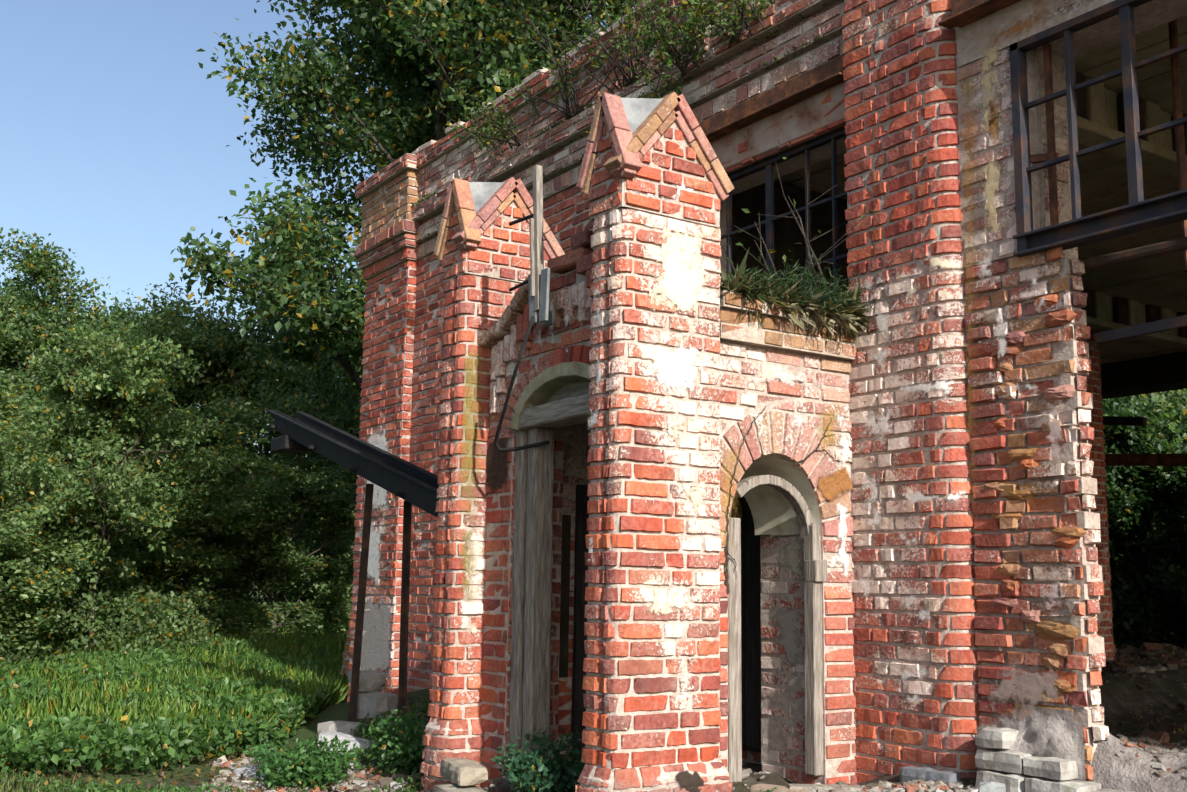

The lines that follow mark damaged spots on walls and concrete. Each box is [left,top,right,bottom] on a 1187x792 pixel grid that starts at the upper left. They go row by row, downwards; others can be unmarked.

water stain [989,101,999,145]
peeling [649,227,707,311]
spalling [1032,279,1077,329]
peeling [651,342,702,394]
spalling [988,311,1076,472]
crack [725,406,836,594]
spalling [905,481,1037,525]
spalling [1052,527,1087,548]
spalling [987,563,1080,721]